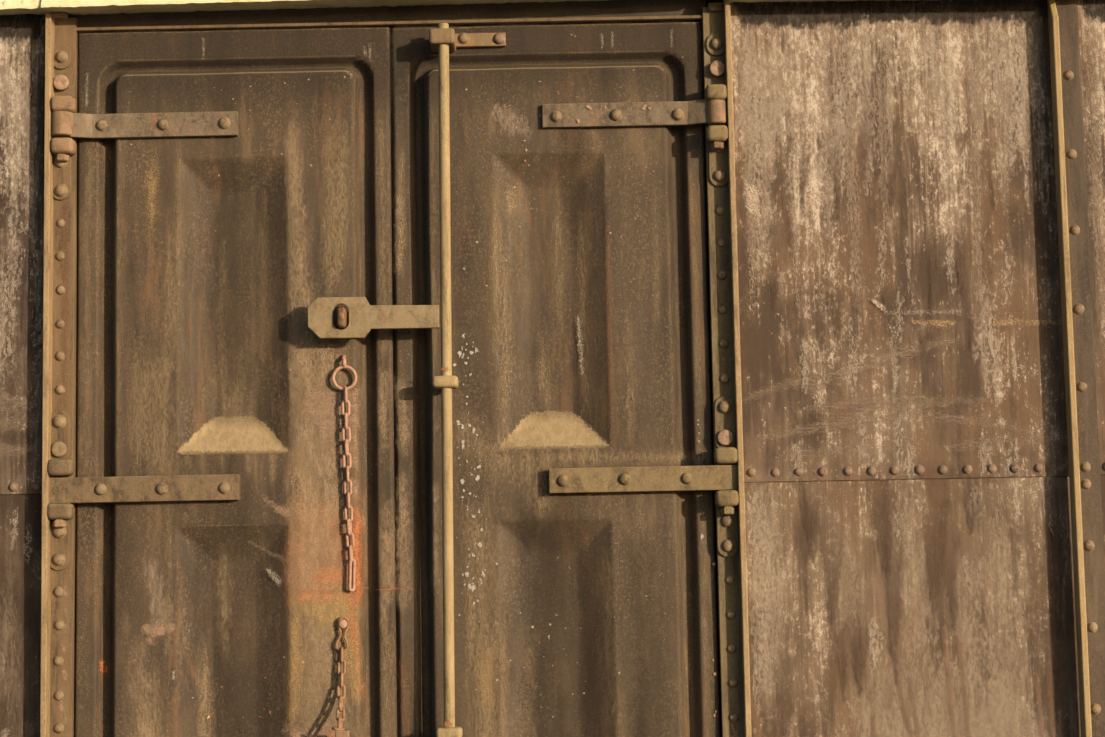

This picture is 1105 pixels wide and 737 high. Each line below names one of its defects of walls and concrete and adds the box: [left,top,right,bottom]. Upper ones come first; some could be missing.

peeling [743,184,760,214]
corrosion [283,500,412,737]